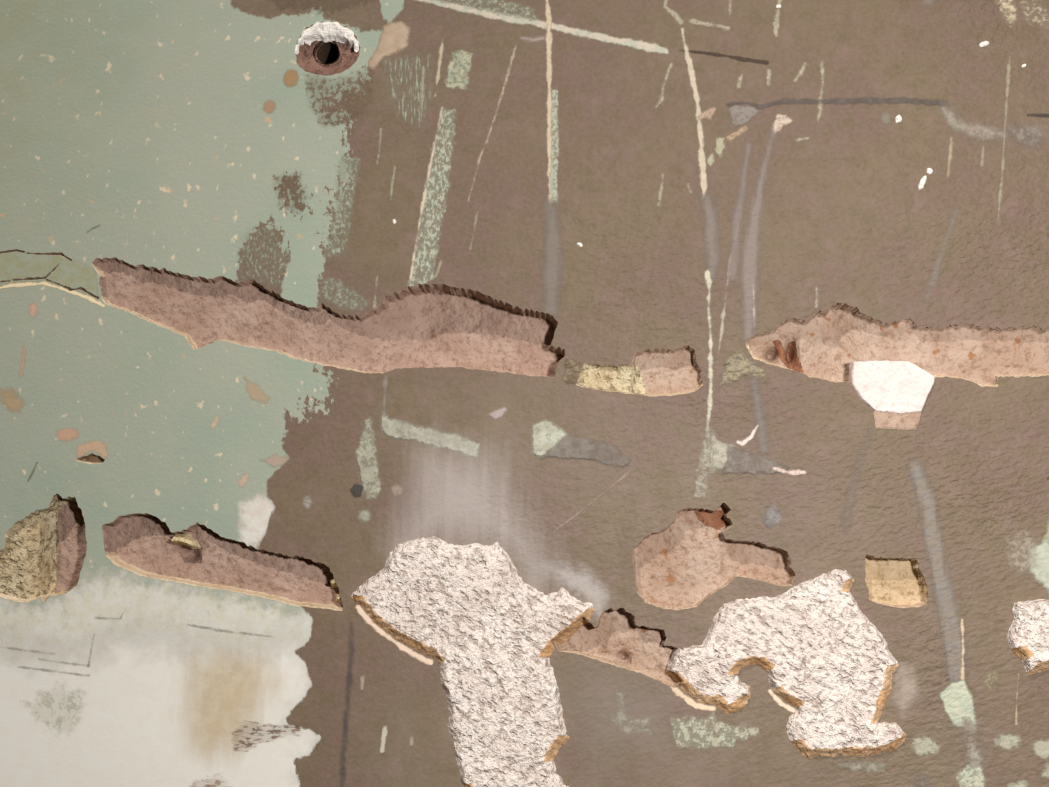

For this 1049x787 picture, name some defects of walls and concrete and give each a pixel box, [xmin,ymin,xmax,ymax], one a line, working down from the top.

crack [0,249,99,299]
spalling [0,281,198,350]
spalling [216,340,382,374]
spalling [545,354,703,397]
flaking render [720,345,1049,430]
peeling [490,407,507,419]
spalling [633,503,796,610]
peeling [0,552,446,787]
spalling [538,607,751,714]
spalling [728,656,775,675]
spalling [768,685,805,713]